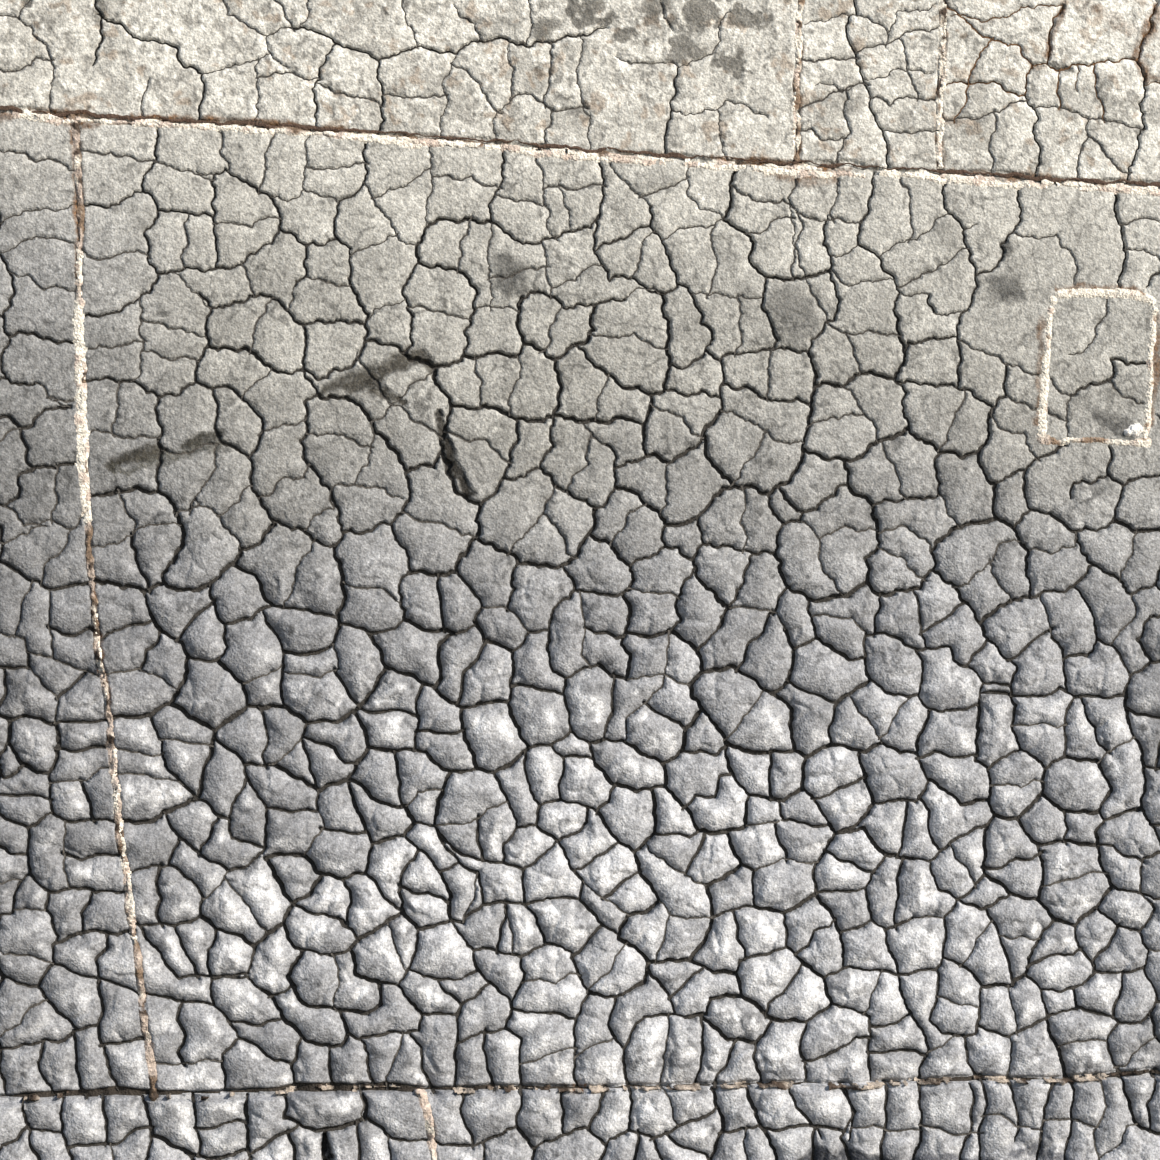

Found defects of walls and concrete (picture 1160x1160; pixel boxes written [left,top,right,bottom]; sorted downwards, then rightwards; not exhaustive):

crack [0,0,55,114]
crack [0,150,74,171]
crack [0,204,75,228]
crack [92,0,607,151]
crack [615,12,768,159]
crack [797,0,1160,184]
crack [80,130,330,979]
crack [0,236,145,1100]
crack [135,131,1160,1160]
crack [0,1085,428,1160]